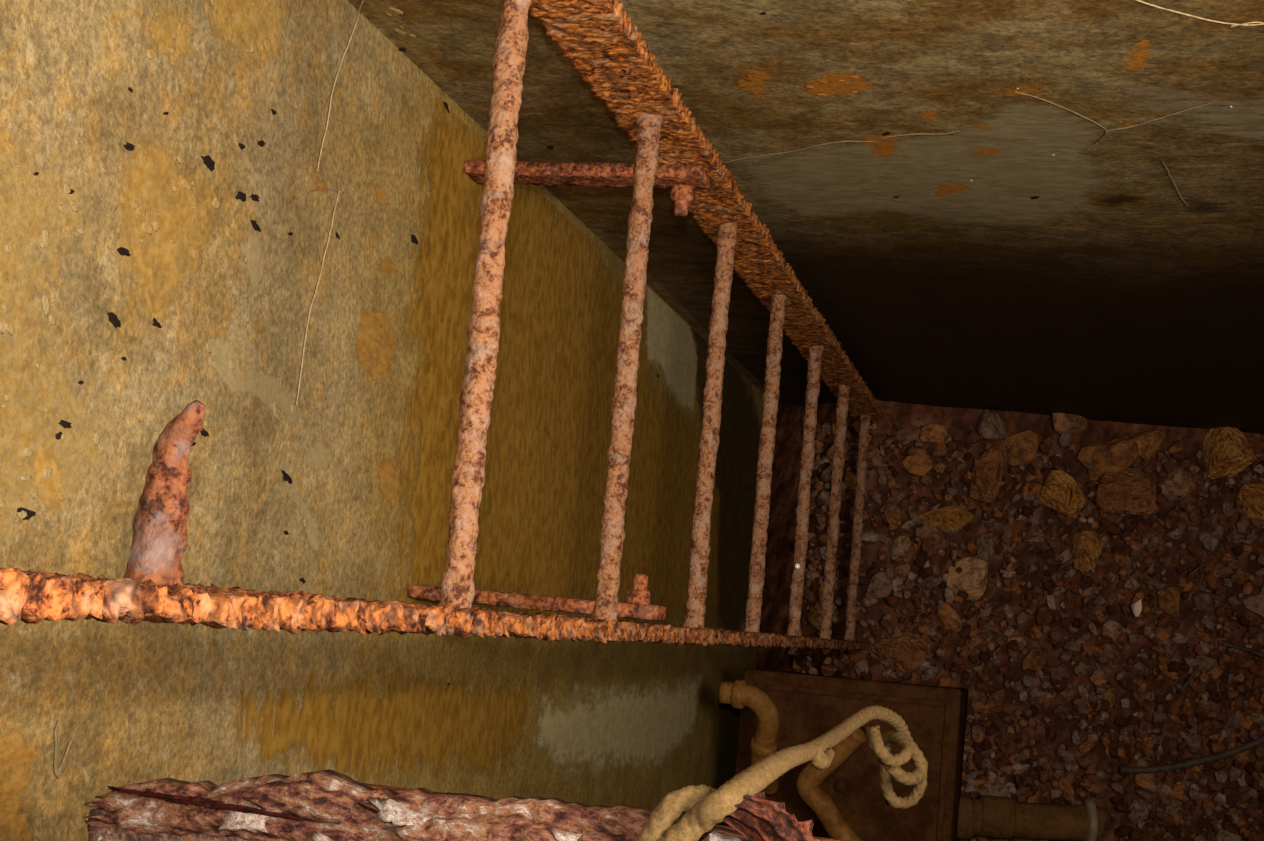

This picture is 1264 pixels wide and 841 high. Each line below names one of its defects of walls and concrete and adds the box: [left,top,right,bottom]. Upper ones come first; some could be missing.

crack [1136,0,1264,27]
rust [804,71,874,98]
rust [0,720,74,841]
rust [82,770,653,841]
rust [698,826,745,841]